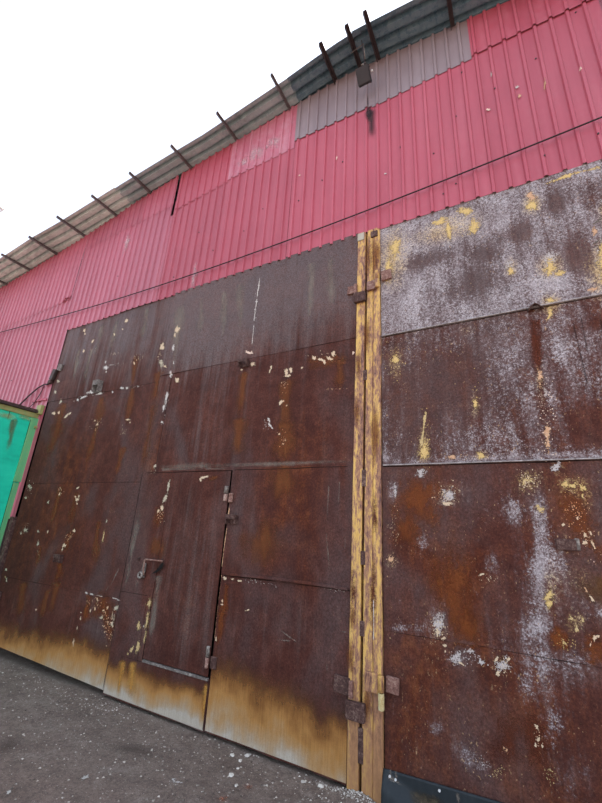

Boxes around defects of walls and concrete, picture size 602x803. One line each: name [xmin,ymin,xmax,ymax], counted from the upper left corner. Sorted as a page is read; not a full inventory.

peeling [432,207,480,242]
peeling [526,190,538,211]
peeling [542,246,566,277]
peeling [587,226,602,293]
peeling [158,326,180,383]
rust [529,319,543,370]
rust [559,490,592,545]
peeling [77,592,119,646]
peeling [431,612,512,677]
rust [0,626,347,783]
rust [493,712,546,764]